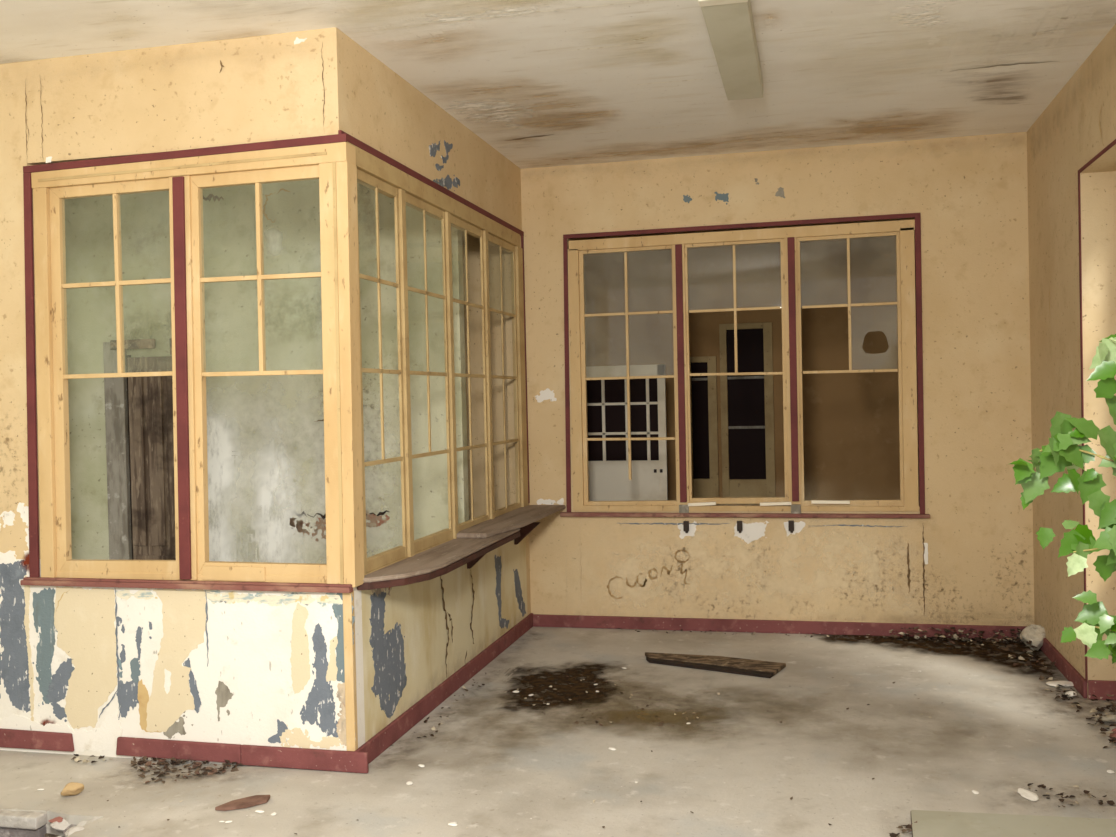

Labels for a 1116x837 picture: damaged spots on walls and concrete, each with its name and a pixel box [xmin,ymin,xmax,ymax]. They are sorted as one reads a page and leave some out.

peeling [714,192,729,205]
flaking render [366,510,390,528]
flaking render [678,521,697,539]
flaking render [734,521,769,544]
flaking render [784,521,805,536]
peeling [494,555,526,629]
peeling [0,502,356,754]
peeling [369,587,407,718]
water stain [503,664,716,728]